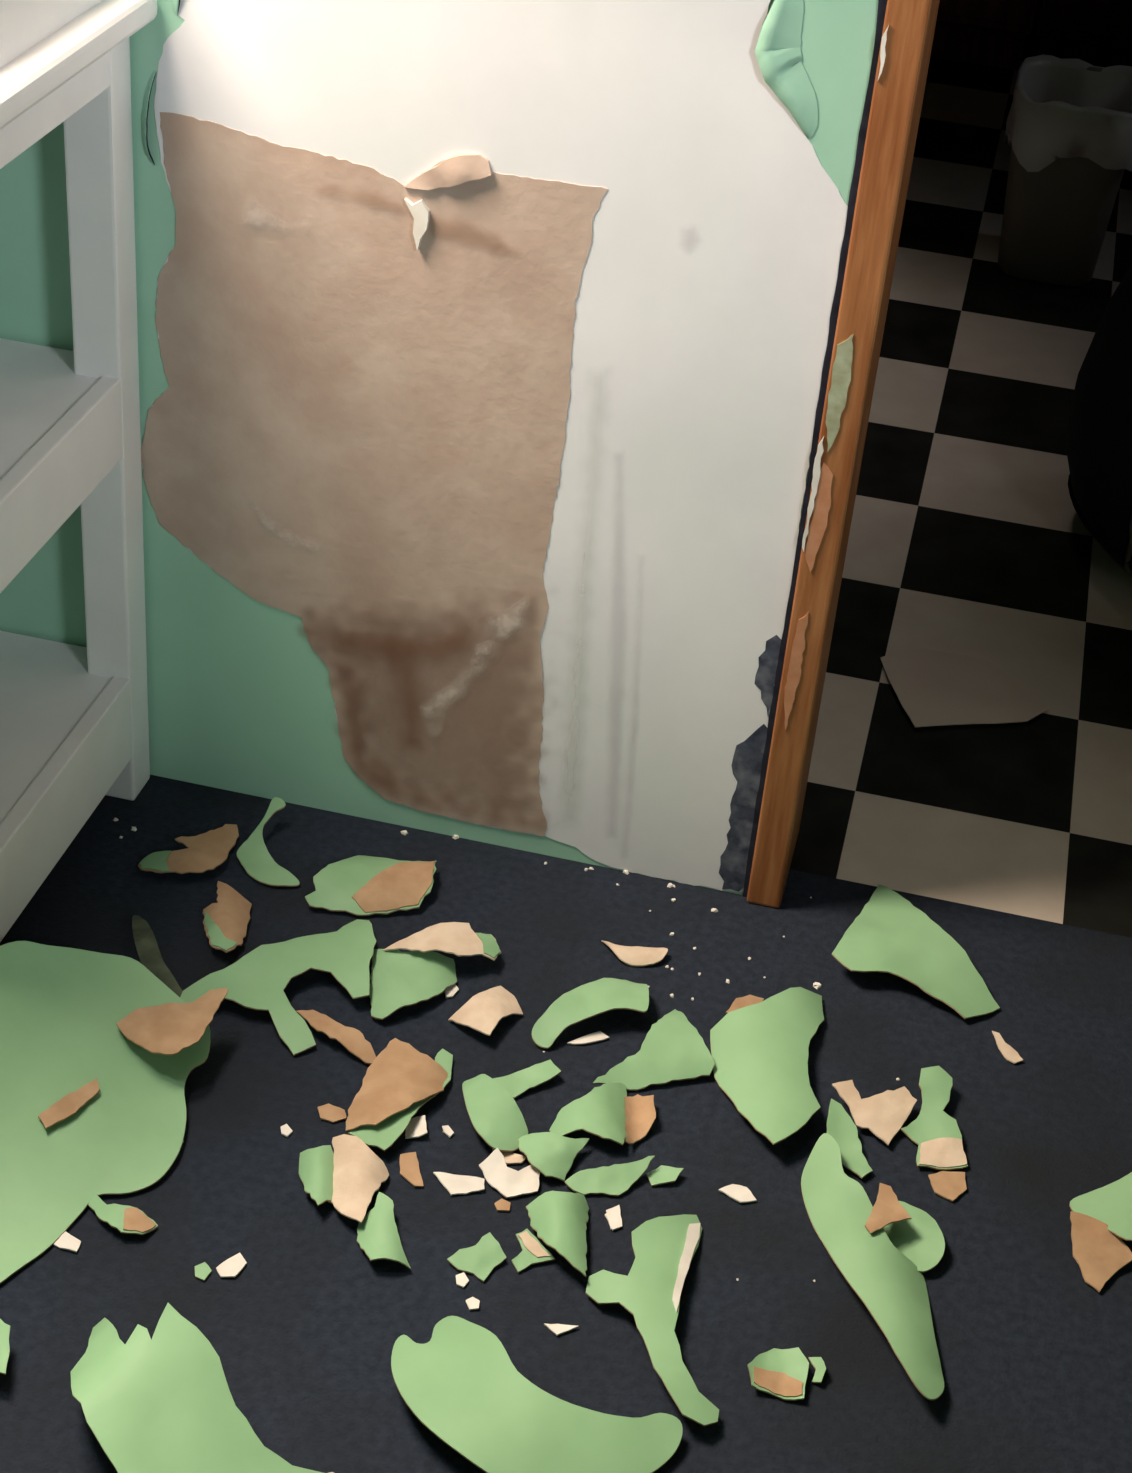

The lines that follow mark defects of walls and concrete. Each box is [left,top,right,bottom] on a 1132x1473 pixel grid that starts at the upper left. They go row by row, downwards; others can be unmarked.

peeling [141,0,848,892]